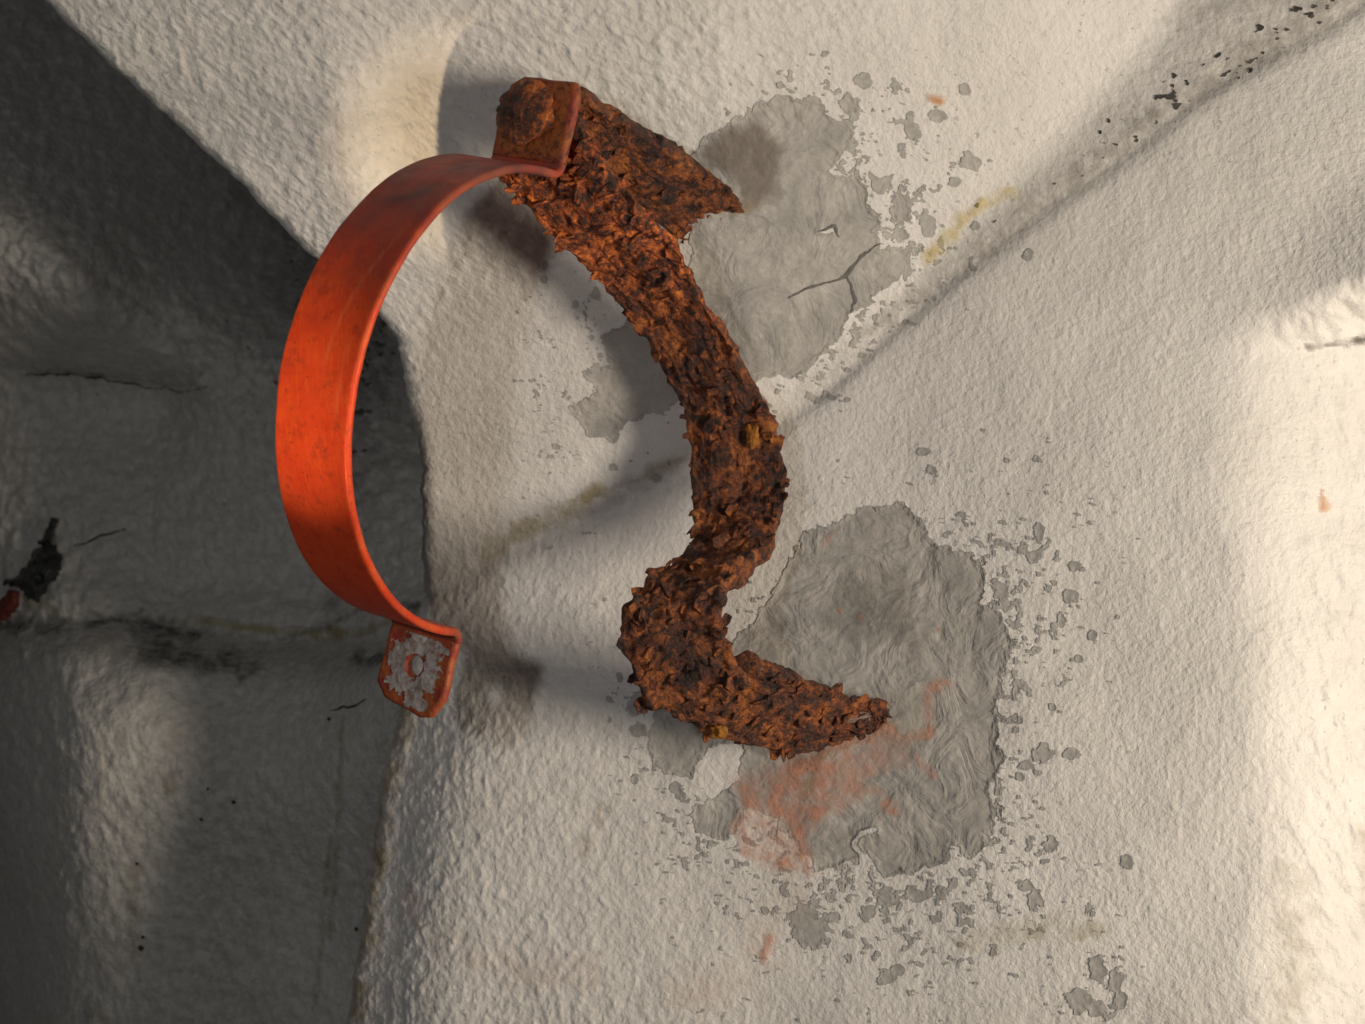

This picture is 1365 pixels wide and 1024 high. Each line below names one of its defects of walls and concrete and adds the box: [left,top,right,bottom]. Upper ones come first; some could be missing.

damp [1189,0,1335,79]
damp [1154,73,1191,122]
crack [788,224,881,313]
peeling [681,51,993,414]
crack [26,372,208,393]
damp [360,321,395,386]
peeling [514,270,679,474]
spalling [918,448,939,485]
peeling [592,484,1122,1003]
spalling [1121,854,1134,870]
spalling [1043,945,1128,1022]